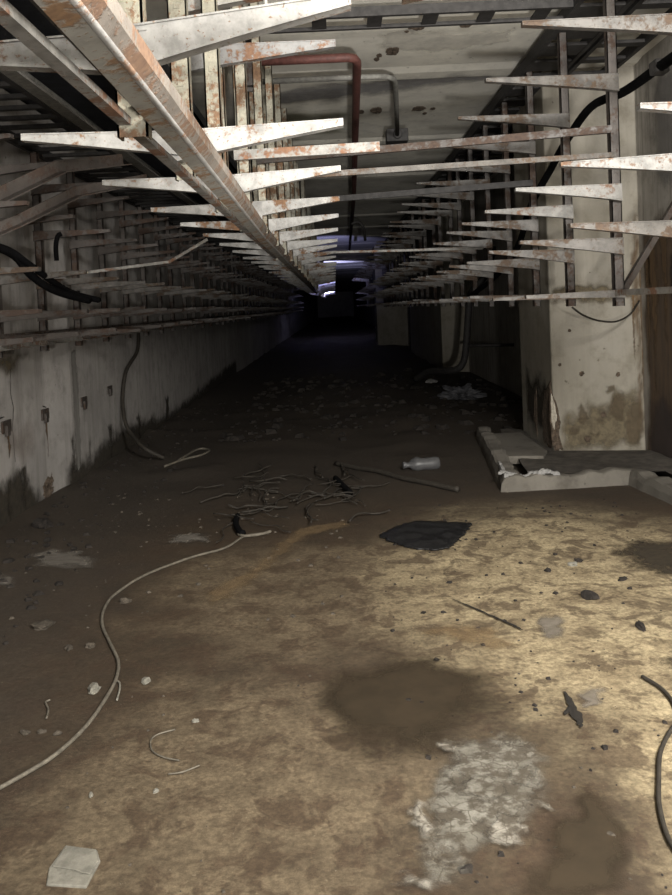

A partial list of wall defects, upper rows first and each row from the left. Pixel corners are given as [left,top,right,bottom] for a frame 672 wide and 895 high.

water stain [526,374,546,426]
water stain [563,386,643,449]
water stain [651,400,672,458]
water stain [0,467,41,528]
water stain [326,659,552,888]
water stain [532,795,625,895]